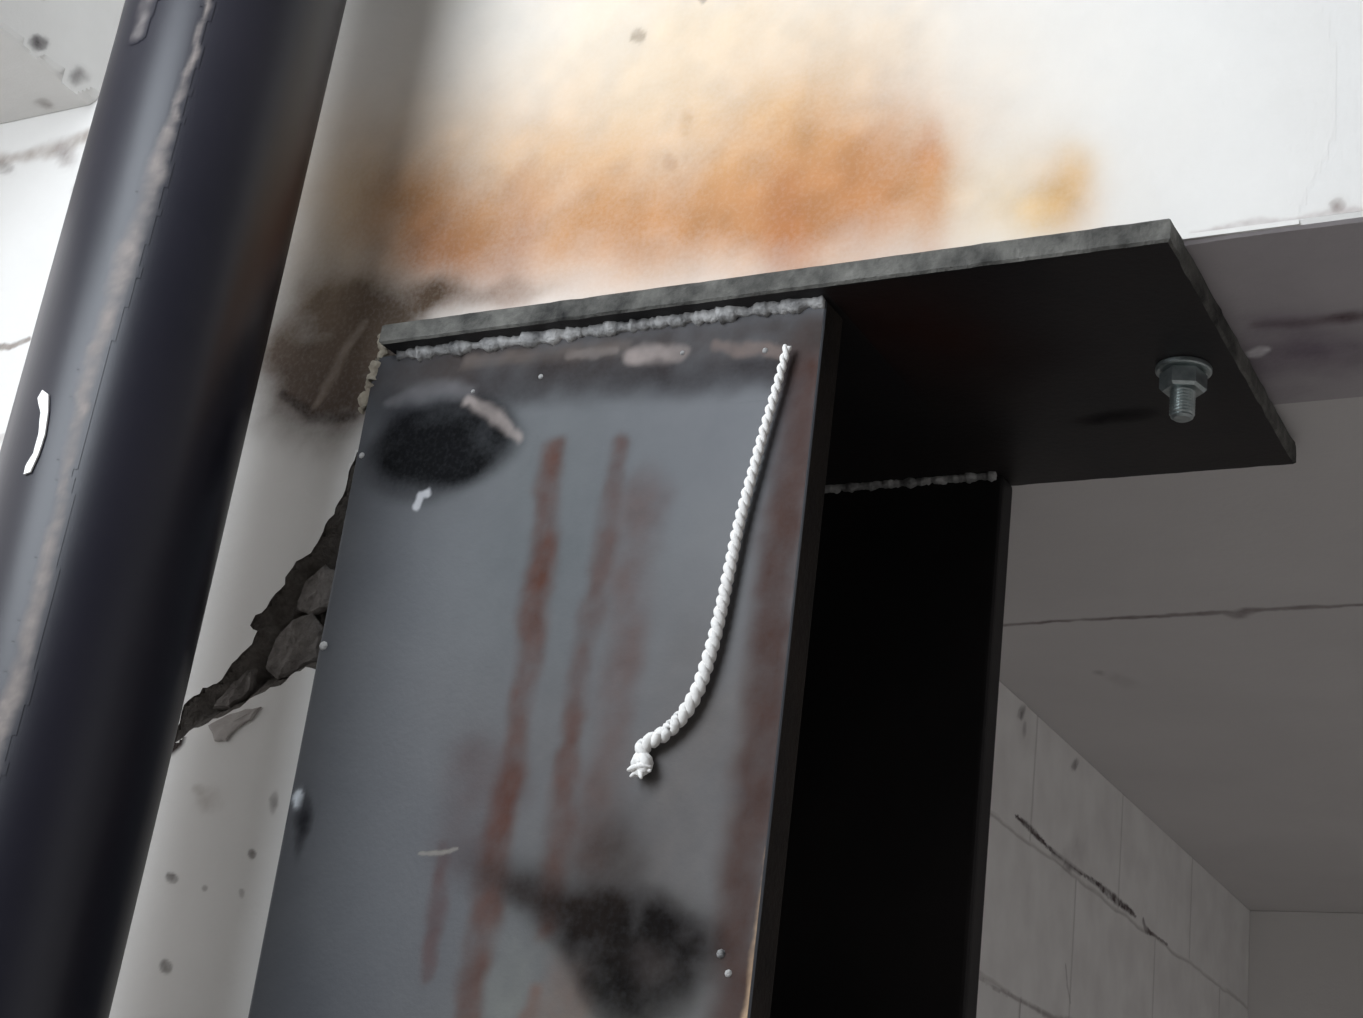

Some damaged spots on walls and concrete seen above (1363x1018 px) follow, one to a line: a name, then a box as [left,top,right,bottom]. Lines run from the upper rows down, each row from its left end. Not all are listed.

corrosion [302,0,1337,300]
crack [0,334,32,353]
crack [170,457,357,761]
corrosion [414,427,684,1018]
corrosion [704,364,818,960]
crack [1014,813,1053,852]
crack [1081,872,1168,947]
crack [1003,603,1363,628]